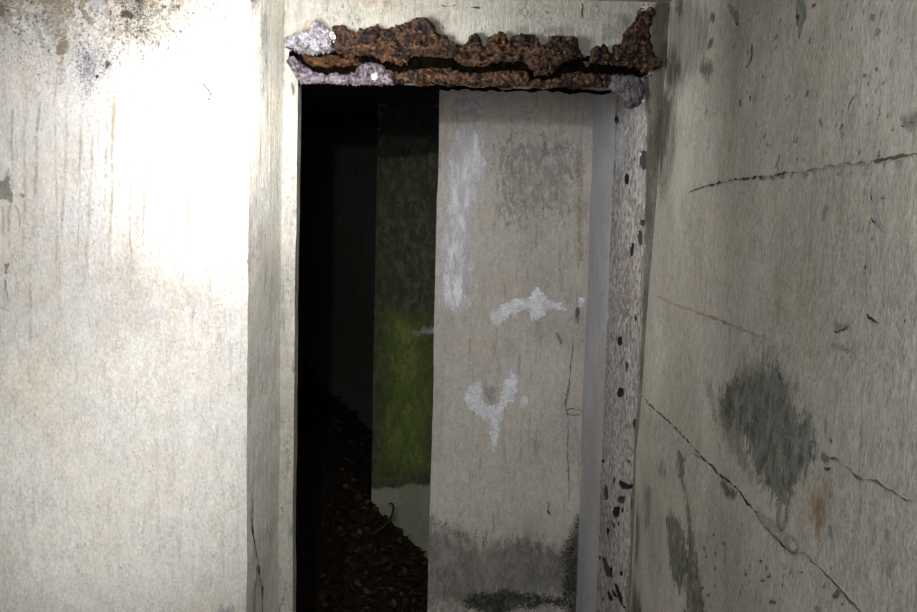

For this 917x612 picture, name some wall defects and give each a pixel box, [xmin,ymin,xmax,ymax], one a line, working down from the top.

leakage [285,20,336,56]
rust [415,17,435,36]
rust [289,29,652,80]
crack [901,114,916,128]
crack [688,151,917,193]
leakage [489,287,585,327]
leakage [626,0,714,612]
crack [641,394,758,514]
leakage [707,354,816,554]
crack [823,421,911,529]
leakage [428,510,579,612]
crack [778,540,864,612]